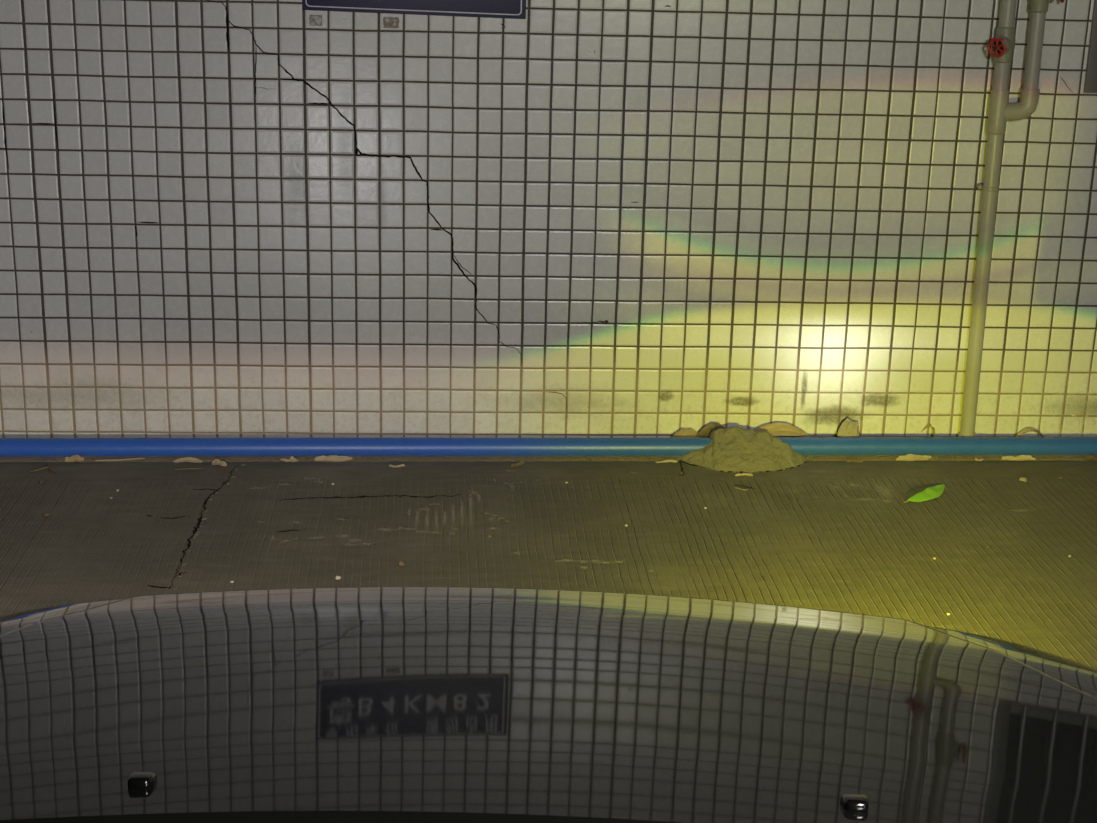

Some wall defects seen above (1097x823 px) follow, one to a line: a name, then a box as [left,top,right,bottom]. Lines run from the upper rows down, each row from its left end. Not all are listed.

crack [208,0,522,363]
crack [146,464,245,590]